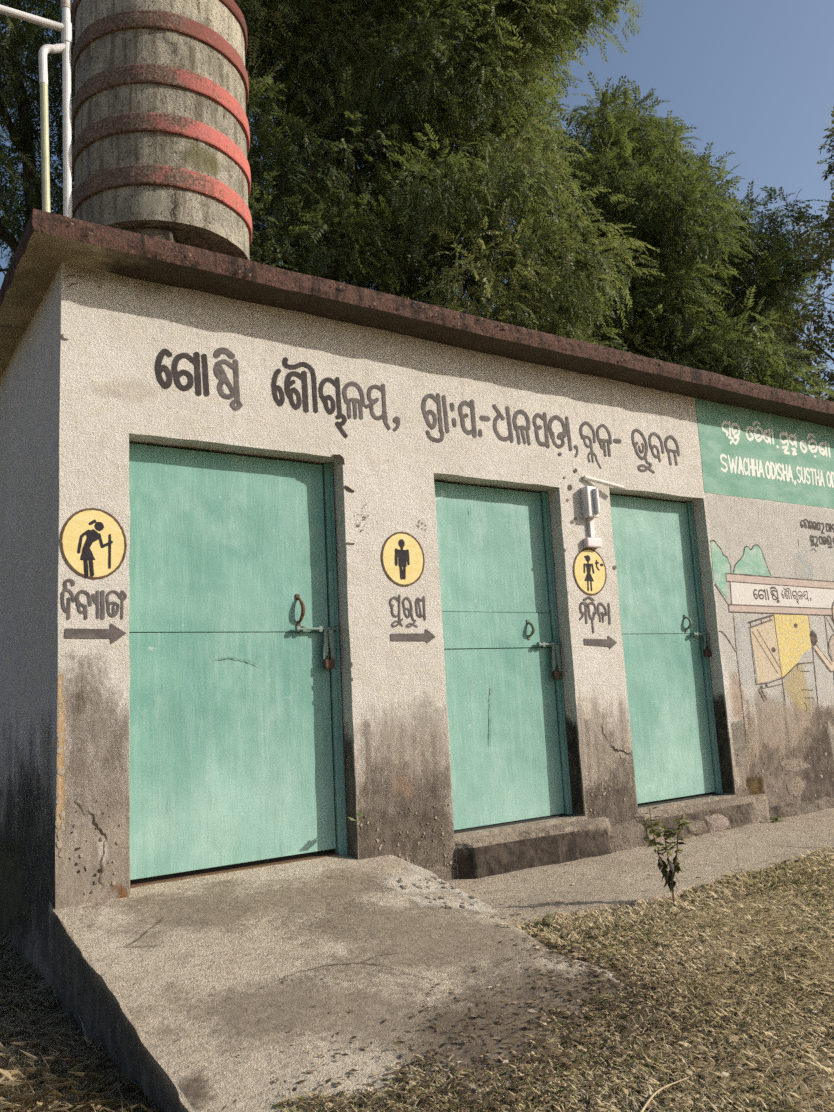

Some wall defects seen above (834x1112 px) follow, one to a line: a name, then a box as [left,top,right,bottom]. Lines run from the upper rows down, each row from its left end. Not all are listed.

crack [75,798,107,888]
water stain [63,666,129,814]
water stain [344,694,834,879]
water stain [0,766,182,1112]
crack [122,918,163,947]
crack [280,953,432,980]